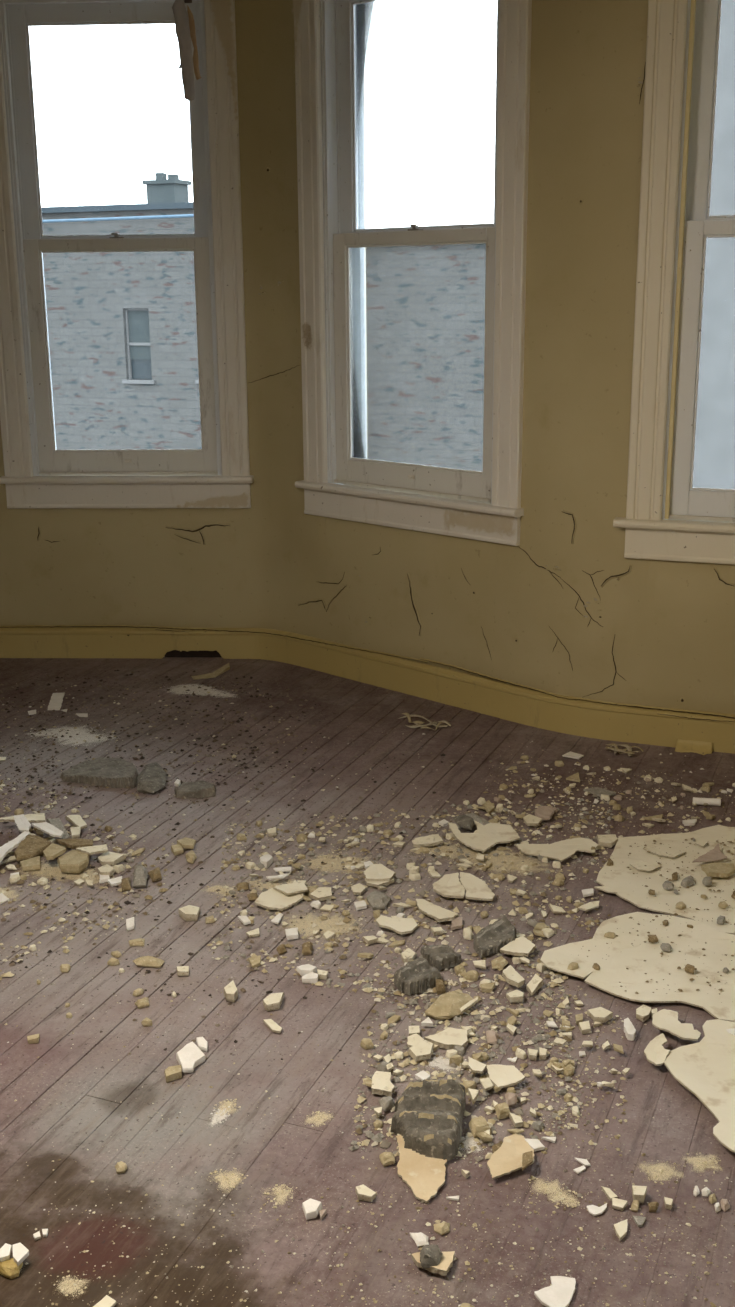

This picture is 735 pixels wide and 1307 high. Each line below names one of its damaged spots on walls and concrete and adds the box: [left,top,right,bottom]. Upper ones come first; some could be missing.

crack [0,510,735,722]